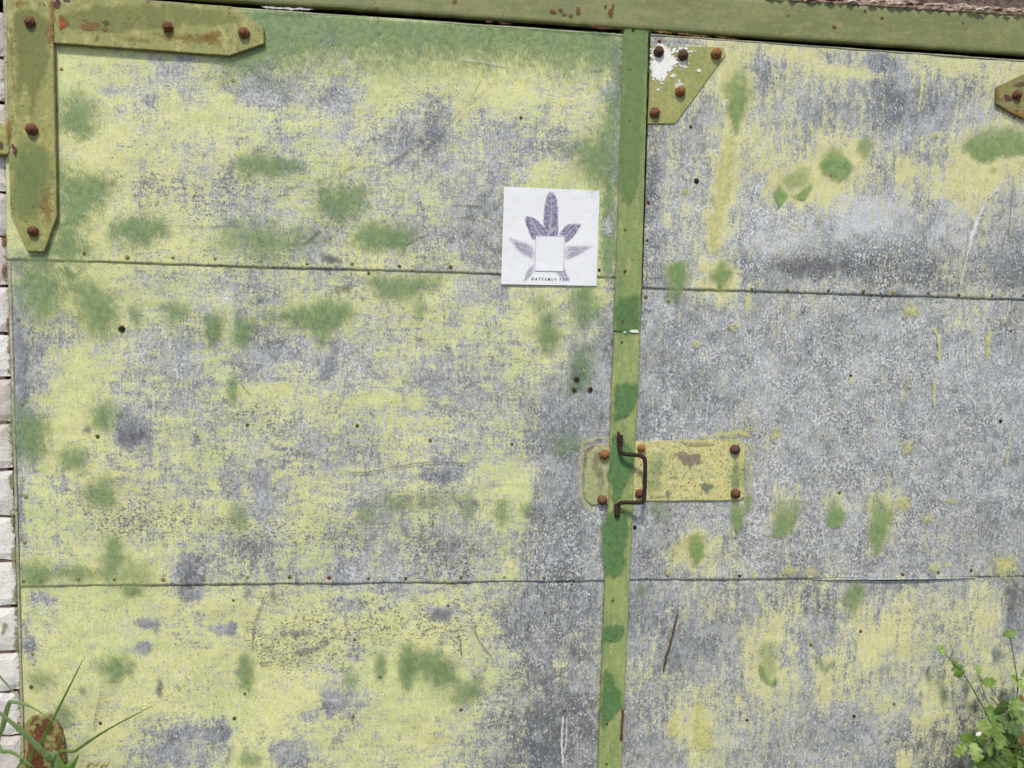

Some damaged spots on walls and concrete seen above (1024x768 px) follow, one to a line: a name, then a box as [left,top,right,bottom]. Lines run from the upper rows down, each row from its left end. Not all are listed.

corrosion [46,0,108,42]
peeling [649,43,701,91]